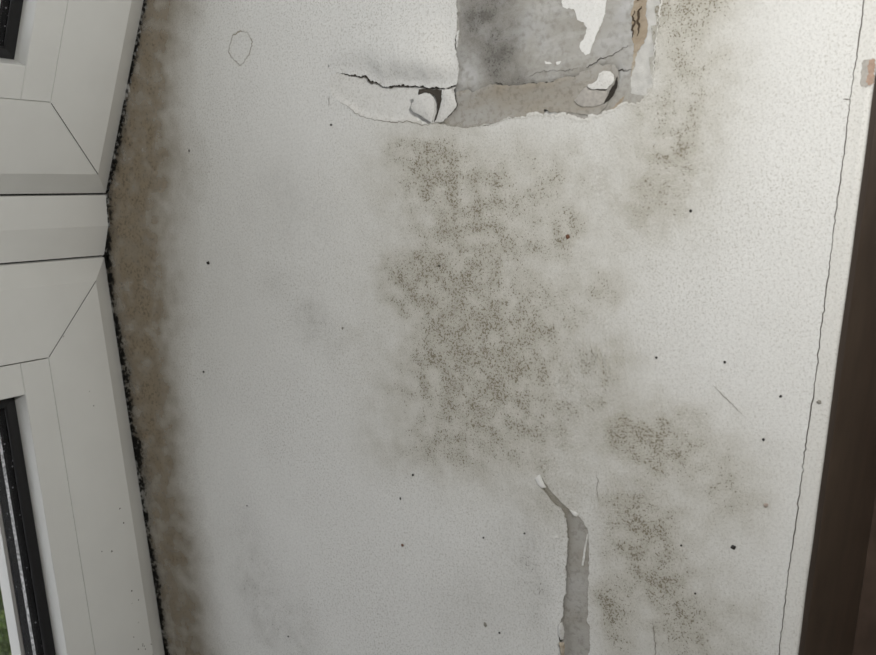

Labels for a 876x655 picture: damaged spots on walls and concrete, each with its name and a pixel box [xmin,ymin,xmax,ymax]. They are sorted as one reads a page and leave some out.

peeling [410,0,663,128]
leakage [631,0,733,227]
leakage [102,0,201,655]
leakage [379,122,624,512]
peeling [535,475,590,655]
leakage [593,405,748,655]